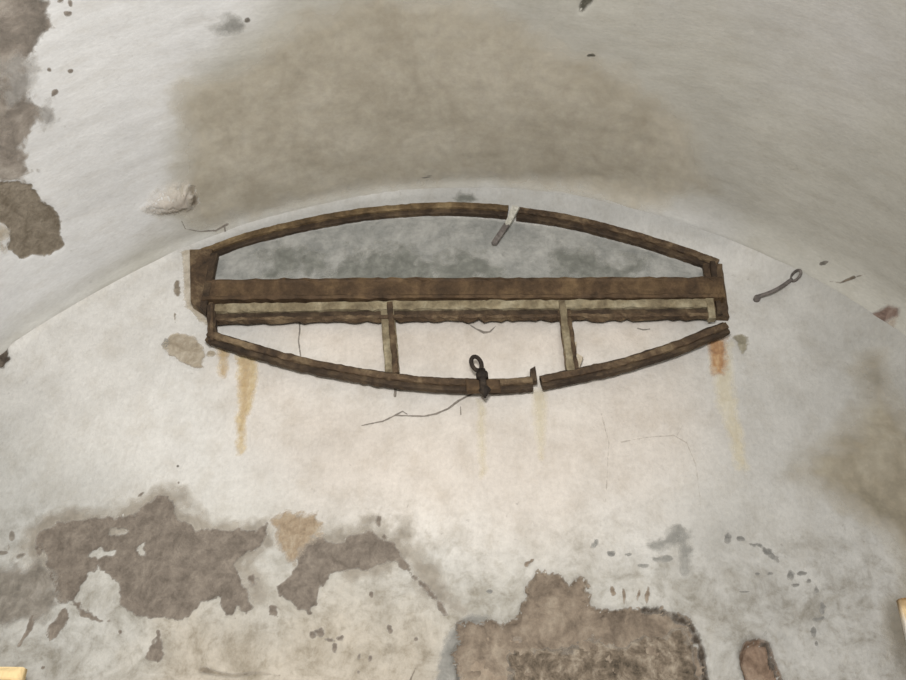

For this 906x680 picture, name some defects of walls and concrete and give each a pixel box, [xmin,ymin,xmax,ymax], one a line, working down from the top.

peeling [0,0,72,259]
water stain [182,0,704,223]
flaking render [162,333,215,368]
corrosion [219,348,257,453]
crack [361,388,472,426]
corrosion [708,339,743,462]
water stain [810,356,906,552]
peeling [18,615,34,647]
crack [199,666,261,677]
peeling [23,482,709,680]
water stain [890,608,906,646]